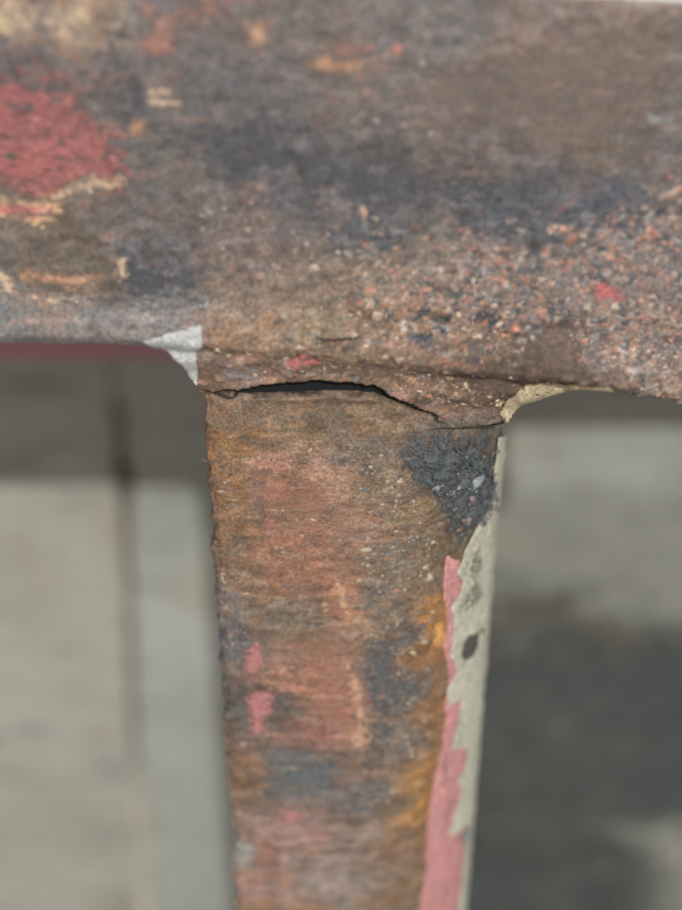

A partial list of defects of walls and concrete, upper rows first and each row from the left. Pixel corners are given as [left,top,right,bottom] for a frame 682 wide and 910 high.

crack [204,380,446,424]
corrosion [395,431,500,548]
spalling [499,382,615,423]
corrosion [417,603,449,847]
peeling [420,435,506,910]
leakage [466,586,682,910]